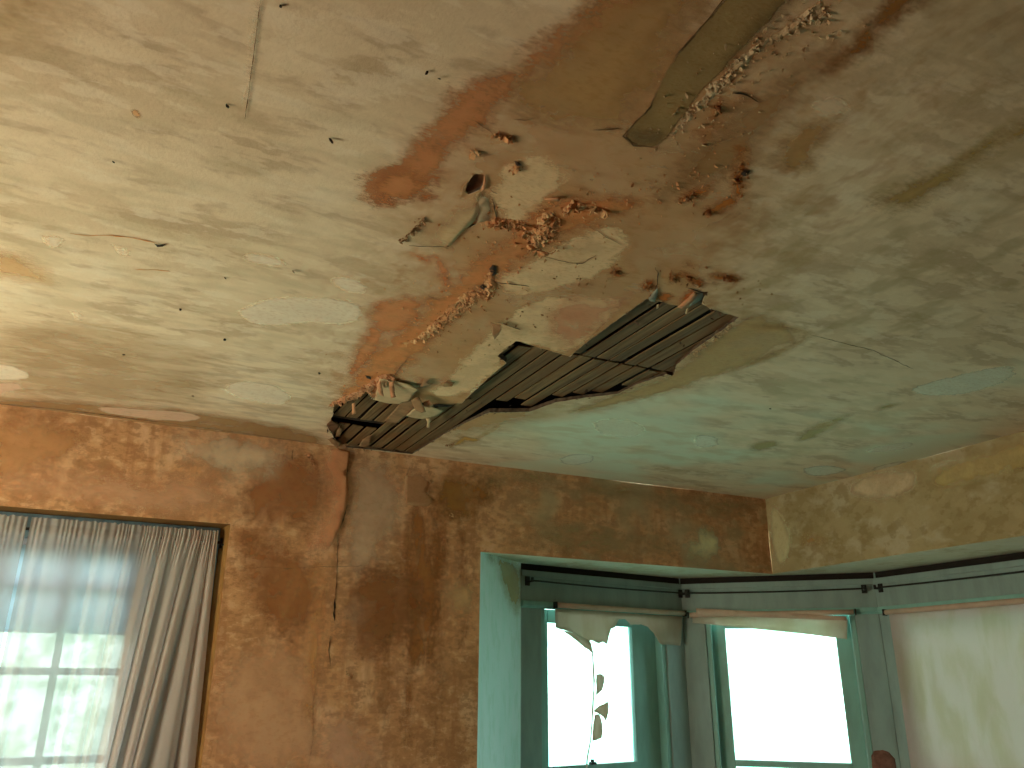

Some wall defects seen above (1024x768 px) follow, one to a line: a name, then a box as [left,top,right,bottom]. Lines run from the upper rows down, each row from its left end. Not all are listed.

spalling [669,0,831,138]
spalling [438,149,611,259]
water stain [452,0,798,356]
spalling [329,373,397,415]
peeling [423,400,454,428]
spalling [404,265,499,347]
water stain [388,286,517,404]
water stain [456,412,523,430]
water stain [578,316,794,410]
water stain [246,458,323,521]
water stain [351,510,444,663]